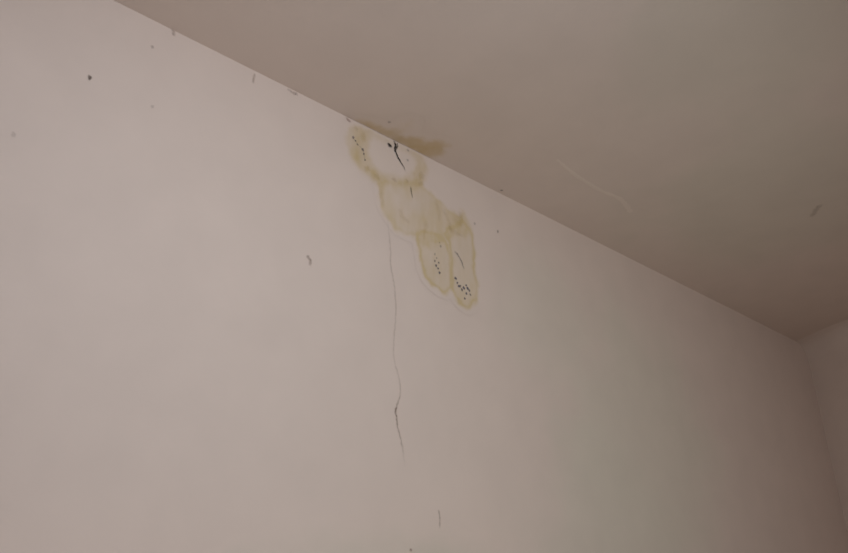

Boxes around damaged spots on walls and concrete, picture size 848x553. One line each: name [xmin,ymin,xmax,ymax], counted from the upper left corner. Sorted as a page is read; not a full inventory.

leakage [341,113,483,316]